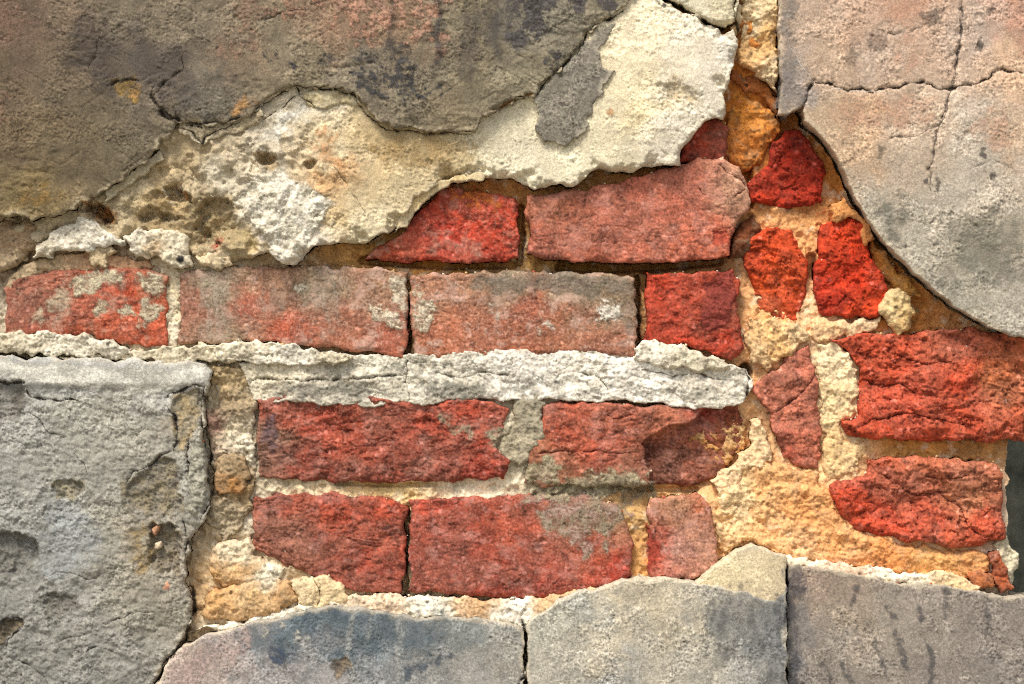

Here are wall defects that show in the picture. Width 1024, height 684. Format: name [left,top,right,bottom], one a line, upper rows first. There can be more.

spalling [263,87,364,139]
crack [794,4,1022,190]
flaking render [33,216,235,271]
spalling [234,169,333,262]
spalling [696,268,737,331]
spalling [121,364,259,541]
spalling [682,420,746,465]
spalling [50,479,84,501]
crack [127,384,215,683]
spalling [645,523,661,568]
spalling [715,461,990,579]
crack [518,620,528,684]